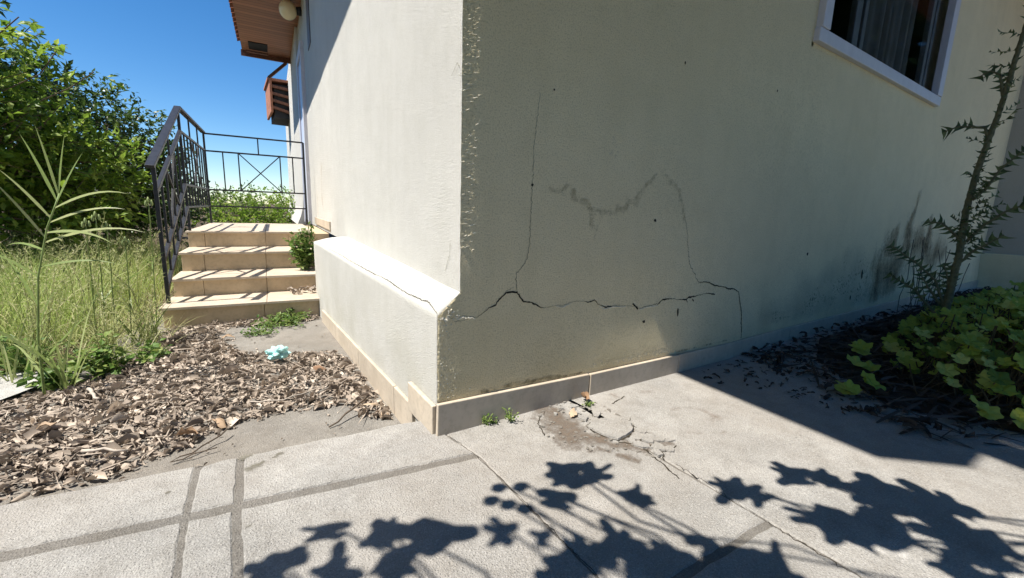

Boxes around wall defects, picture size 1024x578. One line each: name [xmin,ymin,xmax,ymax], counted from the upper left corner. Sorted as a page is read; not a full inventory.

crack [330,99,742,336]